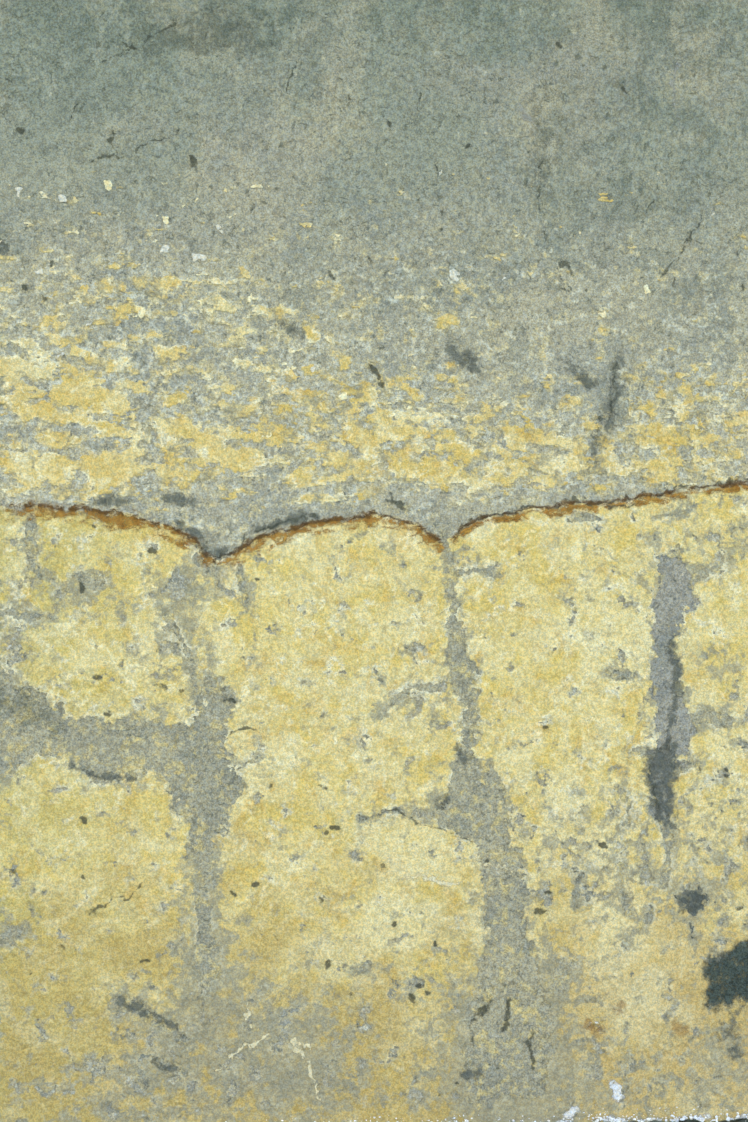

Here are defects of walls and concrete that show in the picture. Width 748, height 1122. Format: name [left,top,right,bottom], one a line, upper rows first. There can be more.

peeling [143,215,177,260]
peeling [0,246,748,513]
crack [217,515,316,558]
crack [385,492,405,510]
crack [455,476,748,539]
water stain [642,640,683,829]
mould [703,940,748,1060]